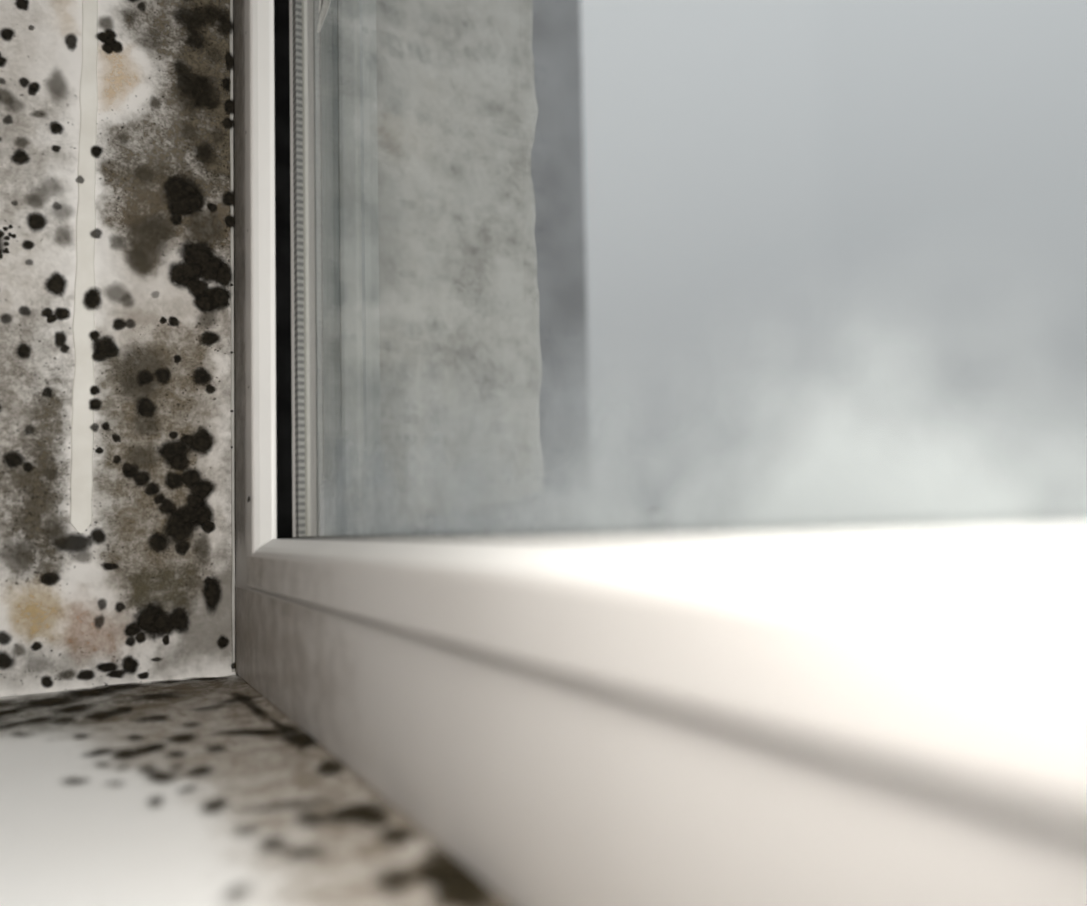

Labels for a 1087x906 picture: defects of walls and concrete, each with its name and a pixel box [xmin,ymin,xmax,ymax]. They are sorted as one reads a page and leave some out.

water stain [0,0,510,906]